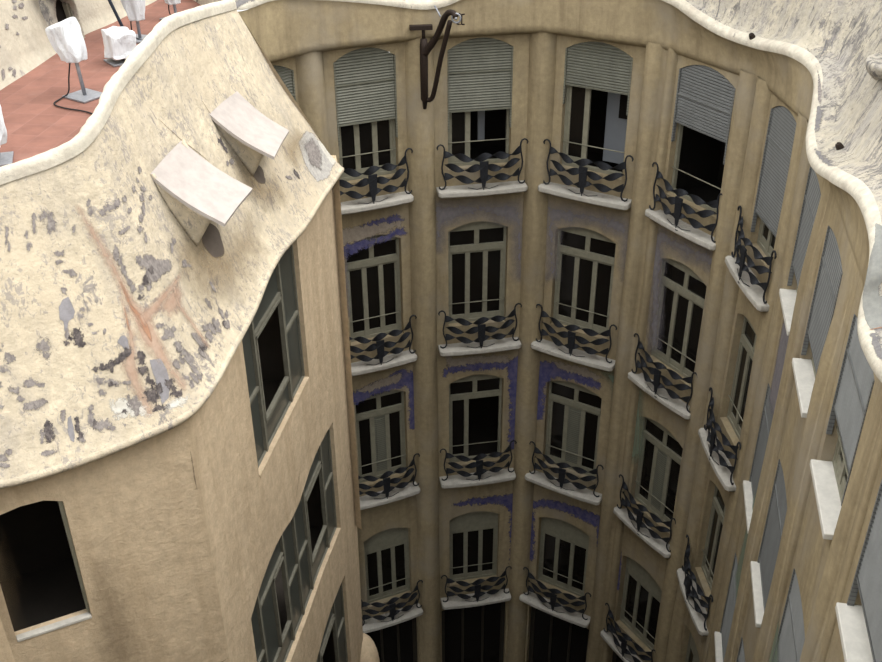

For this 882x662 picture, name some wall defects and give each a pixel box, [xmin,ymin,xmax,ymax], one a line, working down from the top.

peeling [304,139,336,171]
peeling [24,211,56,252]
peeling [53,250,77,278]
spalling [59,287,106,348]
peeling [36,336,51,359]
spalling [91,281,231,417]
peeling [0,349,48,412]
peeling [39,405,116,457]
peeling [0,449,12,469]